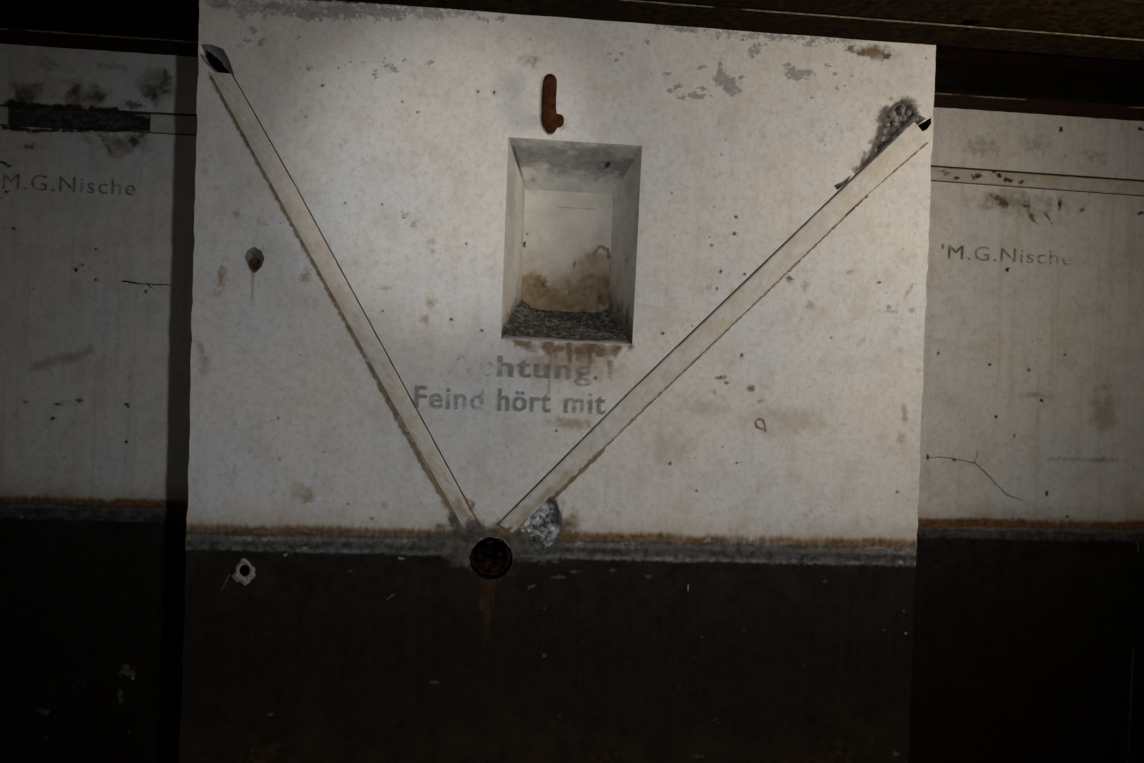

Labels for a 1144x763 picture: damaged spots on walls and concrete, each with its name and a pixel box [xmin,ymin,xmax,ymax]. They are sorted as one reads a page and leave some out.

spalling [834,99,926,190]
rust [210,76,474,536]
rust [512,340,633,366]
rust [552,142,928,498]
crack [927,451,1025,501]
spalling [515,496,577,556]